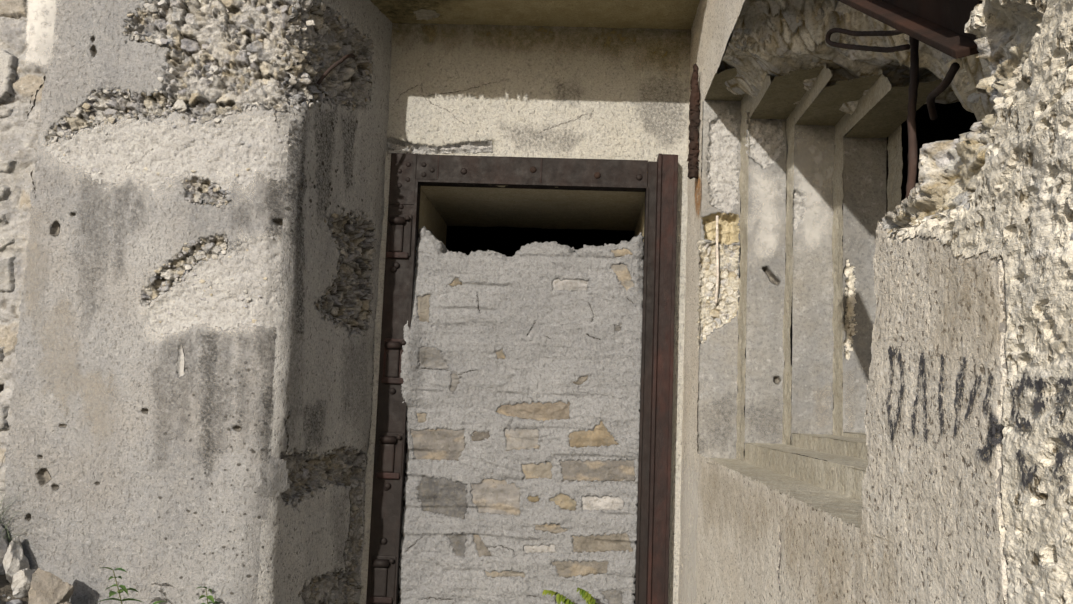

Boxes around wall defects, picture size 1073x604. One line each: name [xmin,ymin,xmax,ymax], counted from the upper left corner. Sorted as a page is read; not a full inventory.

spalling [45,0,377,337]
peeling [138,223,293,377]
corrosion [687,64,701,215]
spalling [696,109,785,350]
peeling [717,0,1073,604]
leakage [182,334,245,476]
leakage [263,380,273,459]
spalling [281,442,366,604]